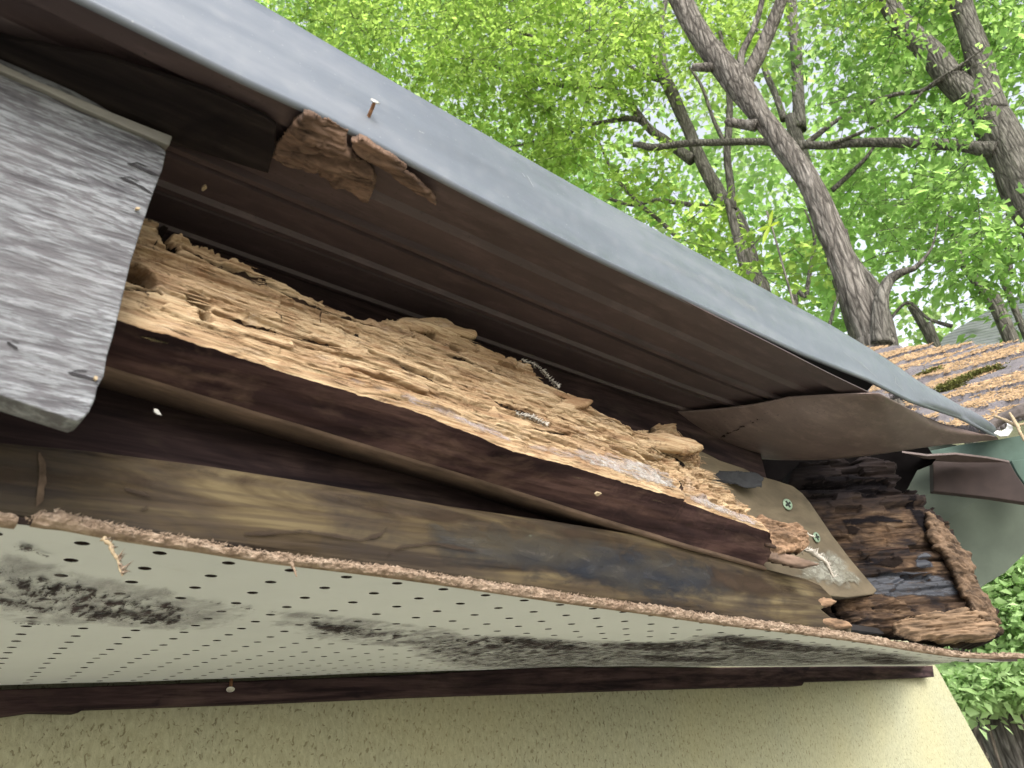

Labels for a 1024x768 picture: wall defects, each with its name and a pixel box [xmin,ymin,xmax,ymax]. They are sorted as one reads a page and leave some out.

spalling [158,225,177,253]
peeling [569,450,674,486]
peeling [691,494,756,524]
water stain [843,495,927,534]
water stain [803,552,958,597]
spalling [924,512,1002,625]
water stain [0,567,199,626]
peeling [818,597,852,630]
water stain [289,614,931,669]